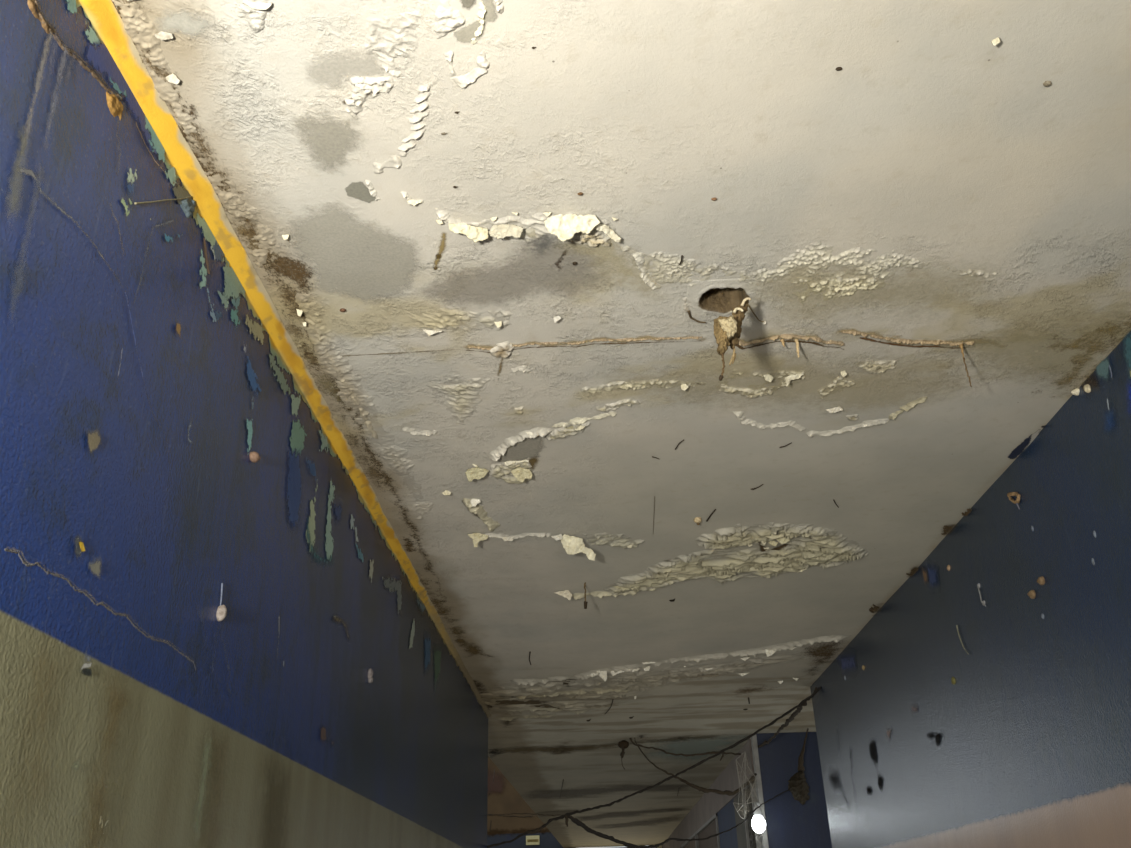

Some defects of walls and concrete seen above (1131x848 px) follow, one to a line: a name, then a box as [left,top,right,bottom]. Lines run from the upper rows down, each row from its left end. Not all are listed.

peeling [401,191,661,290]
peeling [67,0,402,614]
spalling [294,289,451,520]
rust [489,341,515,375]
peeling [465,411,617,484]
peeling [731,396,927,437]
leakage [817,359,898,399]
leakage [1053,322,1131,390]
peeling [468,533,645,561]
peeling [554,522,870,600]
crack [4,547,196,671]